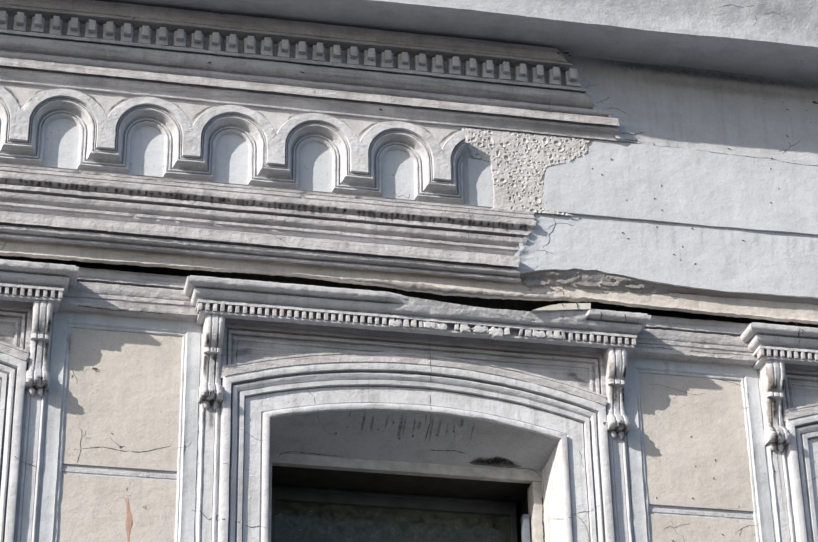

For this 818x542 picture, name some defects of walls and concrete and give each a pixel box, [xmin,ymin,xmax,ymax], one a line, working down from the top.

flaking render [461,127,590,220]
flaking render [521,269,680,299]
crack [78,428,164,459]
peeling [469,458,521,468]